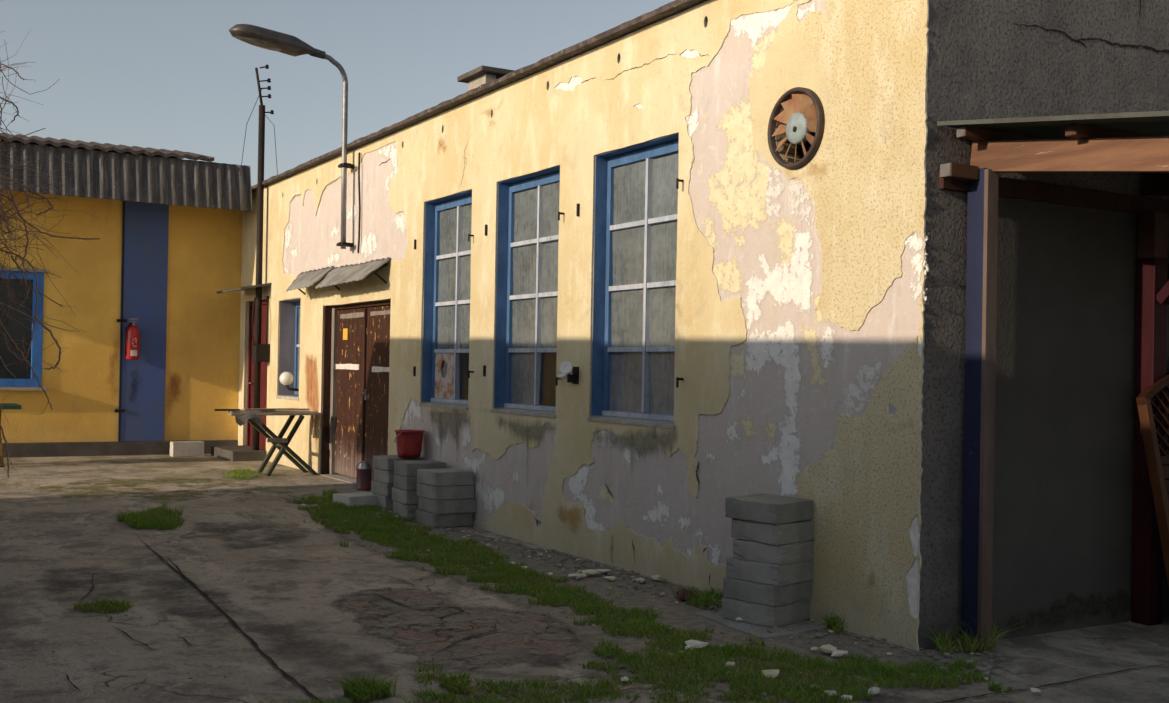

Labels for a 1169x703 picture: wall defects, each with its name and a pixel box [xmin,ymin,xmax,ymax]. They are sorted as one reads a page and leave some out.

flaking render [555,76,582,91]
crack [1013,23,1169,53]
flaking render [283,142,408,276]
flaking render [563,0,929,566]
flaking render [400,398,555,527]
flaking render [906,516,920,619]